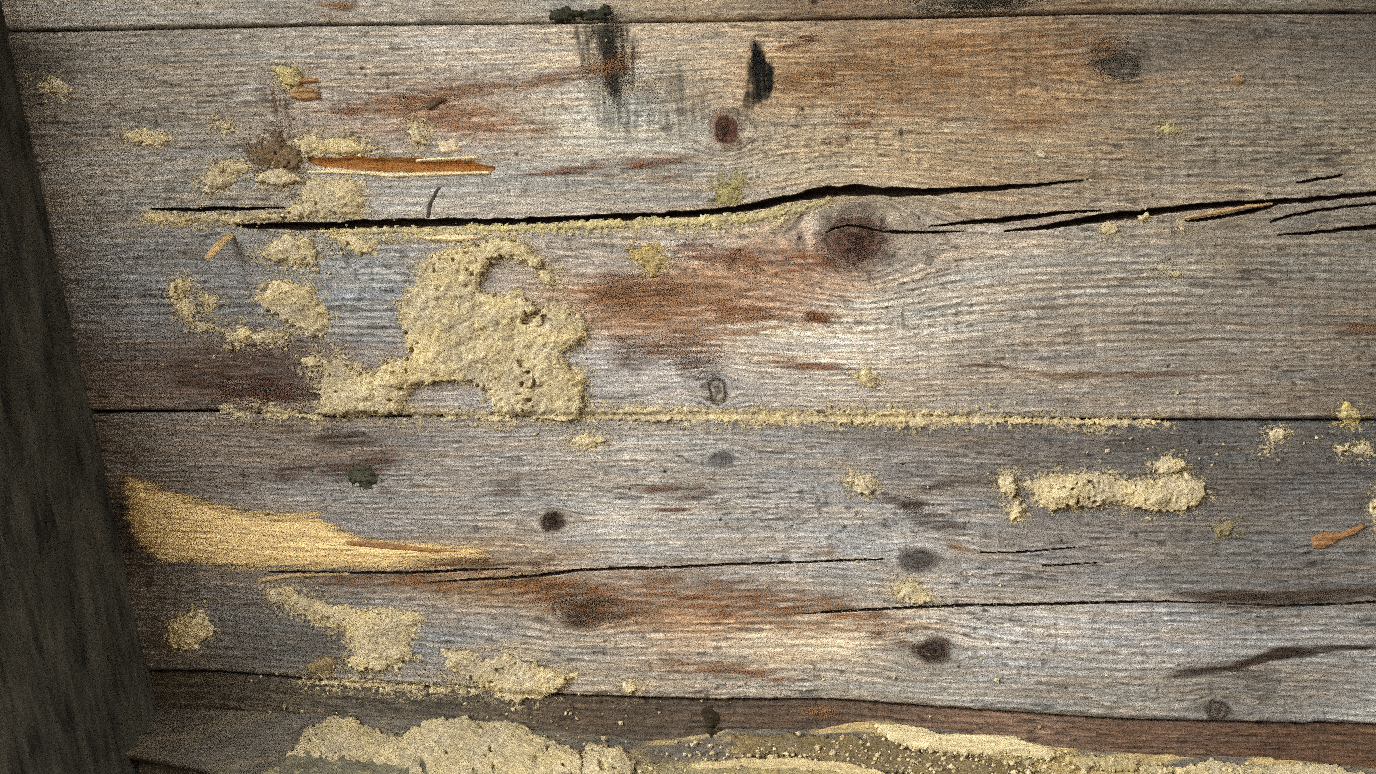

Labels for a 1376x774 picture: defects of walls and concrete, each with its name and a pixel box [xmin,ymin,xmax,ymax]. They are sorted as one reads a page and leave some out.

peeling [288,78,322,102]
peeling [424,97,444,111]
spalling [255,155,494,188]
crack [151,174,1376,235]
peeling [171,292,220,335]
peeling [252,330,286,344]